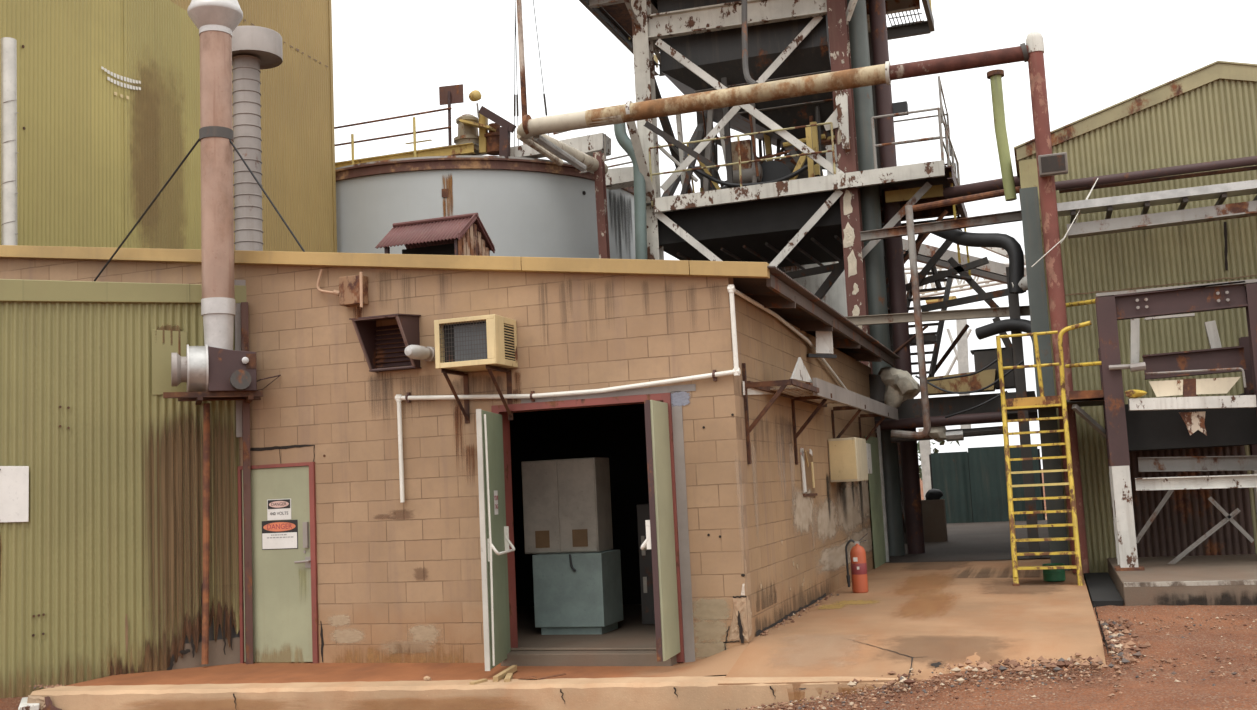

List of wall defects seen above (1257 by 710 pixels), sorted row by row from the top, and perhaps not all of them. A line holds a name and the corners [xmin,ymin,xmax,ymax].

rust [110,583,237,676]